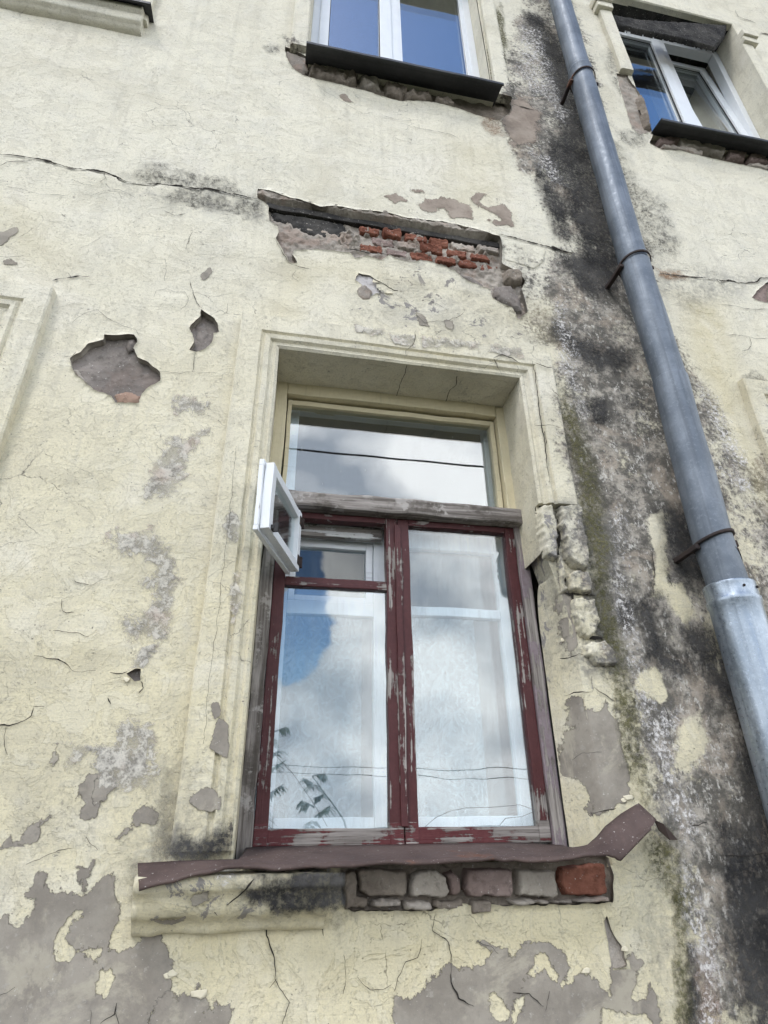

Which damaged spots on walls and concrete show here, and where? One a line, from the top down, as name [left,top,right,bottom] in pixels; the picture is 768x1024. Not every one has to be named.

crack [0,154,255,199]
spalling [286,52,542,148]
damp [517,10,621,296]
spalling [257,189,546,319]
spalling [534,505,617,667]
damp [662,508,705,591]
damp [616,573,740,837]
peeling [0,859,234,1024]
crack [266,930,290,1024]
damp [246,870,346,915]
peeling [391,918,662,1024]
damp [683,743,768,1024]